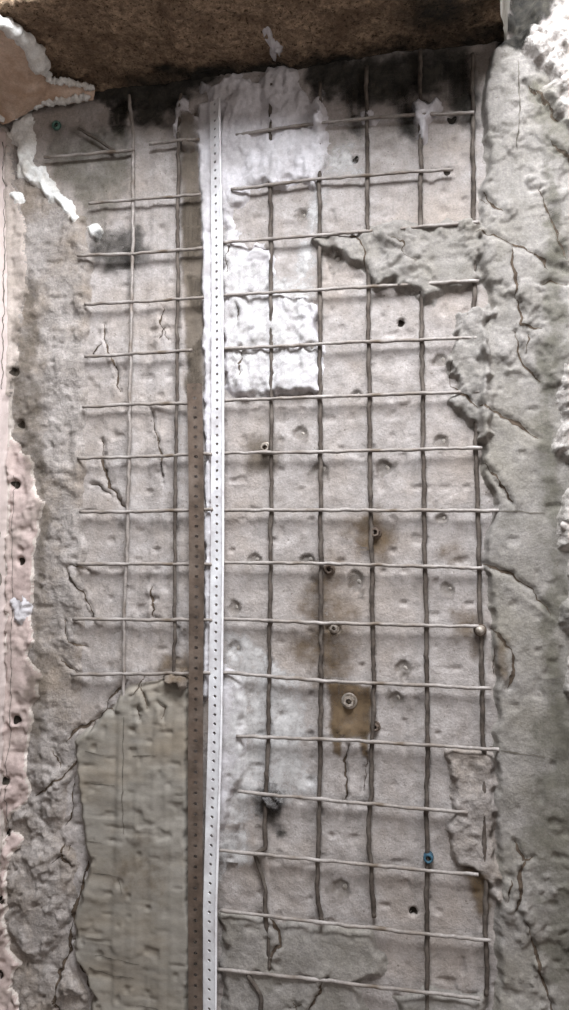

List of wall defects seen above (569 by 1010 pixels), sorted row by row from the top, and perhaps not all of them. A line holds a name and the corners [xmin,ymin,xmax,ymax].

damp [496,0,554,49]
damp [397,84,416,137]
peeling [4,145,29,397]
peeling [86,223,104,242]
damp [93,227,146,271]
spalling [321,240,344,273]
crack [476,190,566,382]
crack [91,441,126,508]
spalling [376,460,397,477]
rust [297,614,372,758]
crack [36,676,166,1010]
crack [507,841,553,1010]